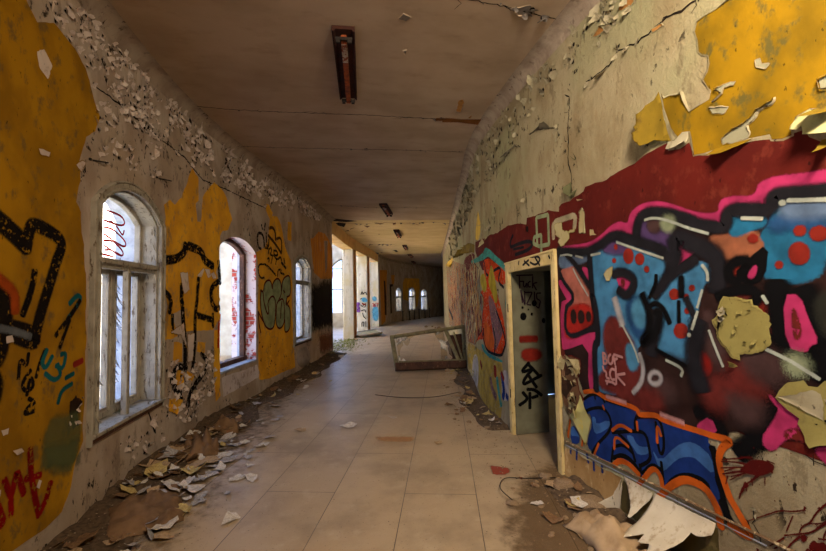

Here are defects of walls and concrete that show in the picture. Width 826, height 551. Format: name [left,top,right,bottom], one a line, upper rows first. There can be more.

crack [454,0,510,10]
crack [563,0,697,198]
peeling [631,0,826,157]
peeling [445,0,636,377]
peeling [712,296,771,368]
peeling [775,380,826,448]
flaking render [672,525,722,551]